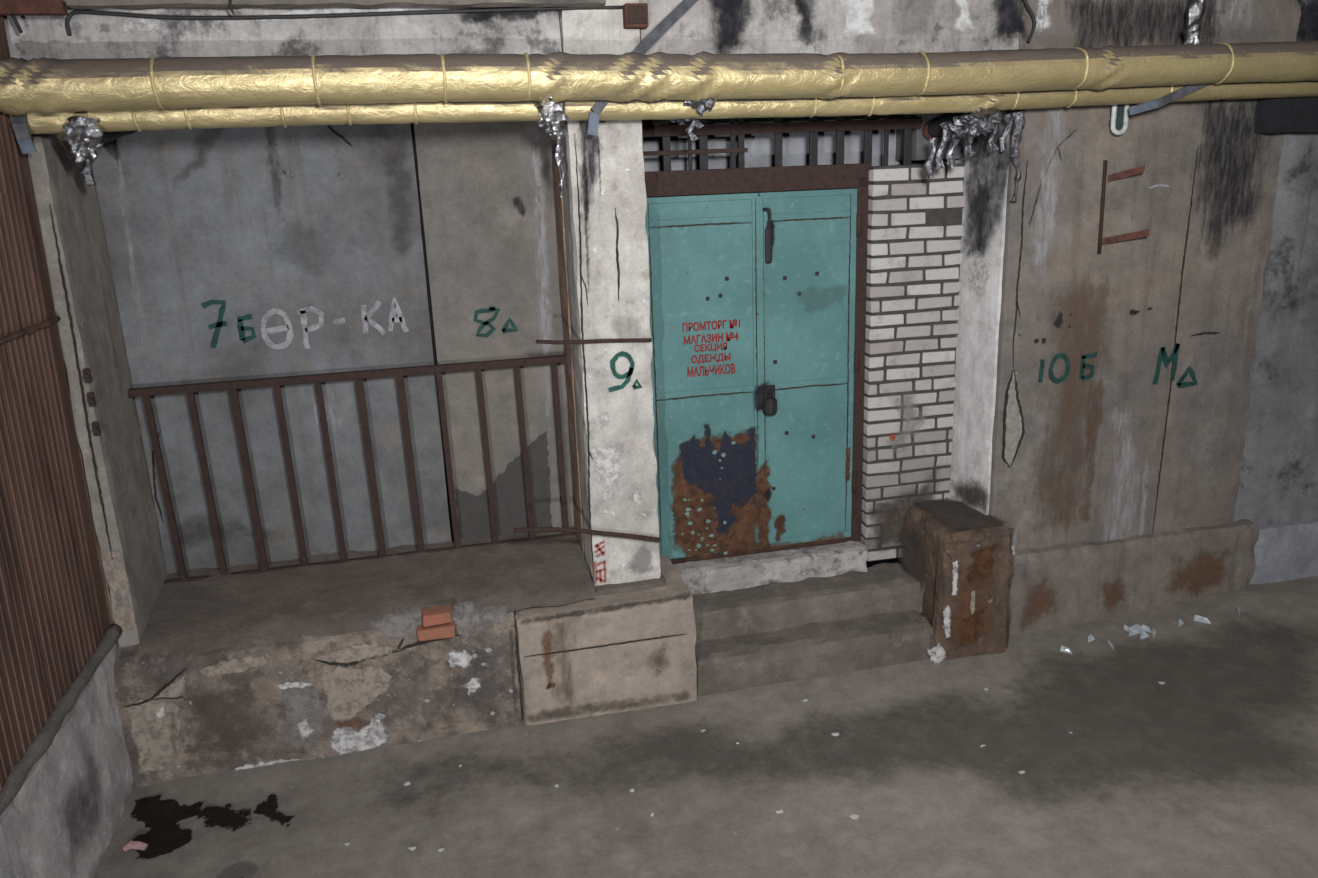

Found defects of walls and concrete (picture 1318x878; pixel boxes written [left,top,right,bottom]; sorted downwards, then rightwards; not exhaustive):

leakage [583,136,601,265]
flaking render [1002,370,1025,467]
peeling [680,424,758,555]
rust [670,431,792,560]
crack [316,635,460,669]
flaking render [279,603,506,755]
rust [953,546,994,645]